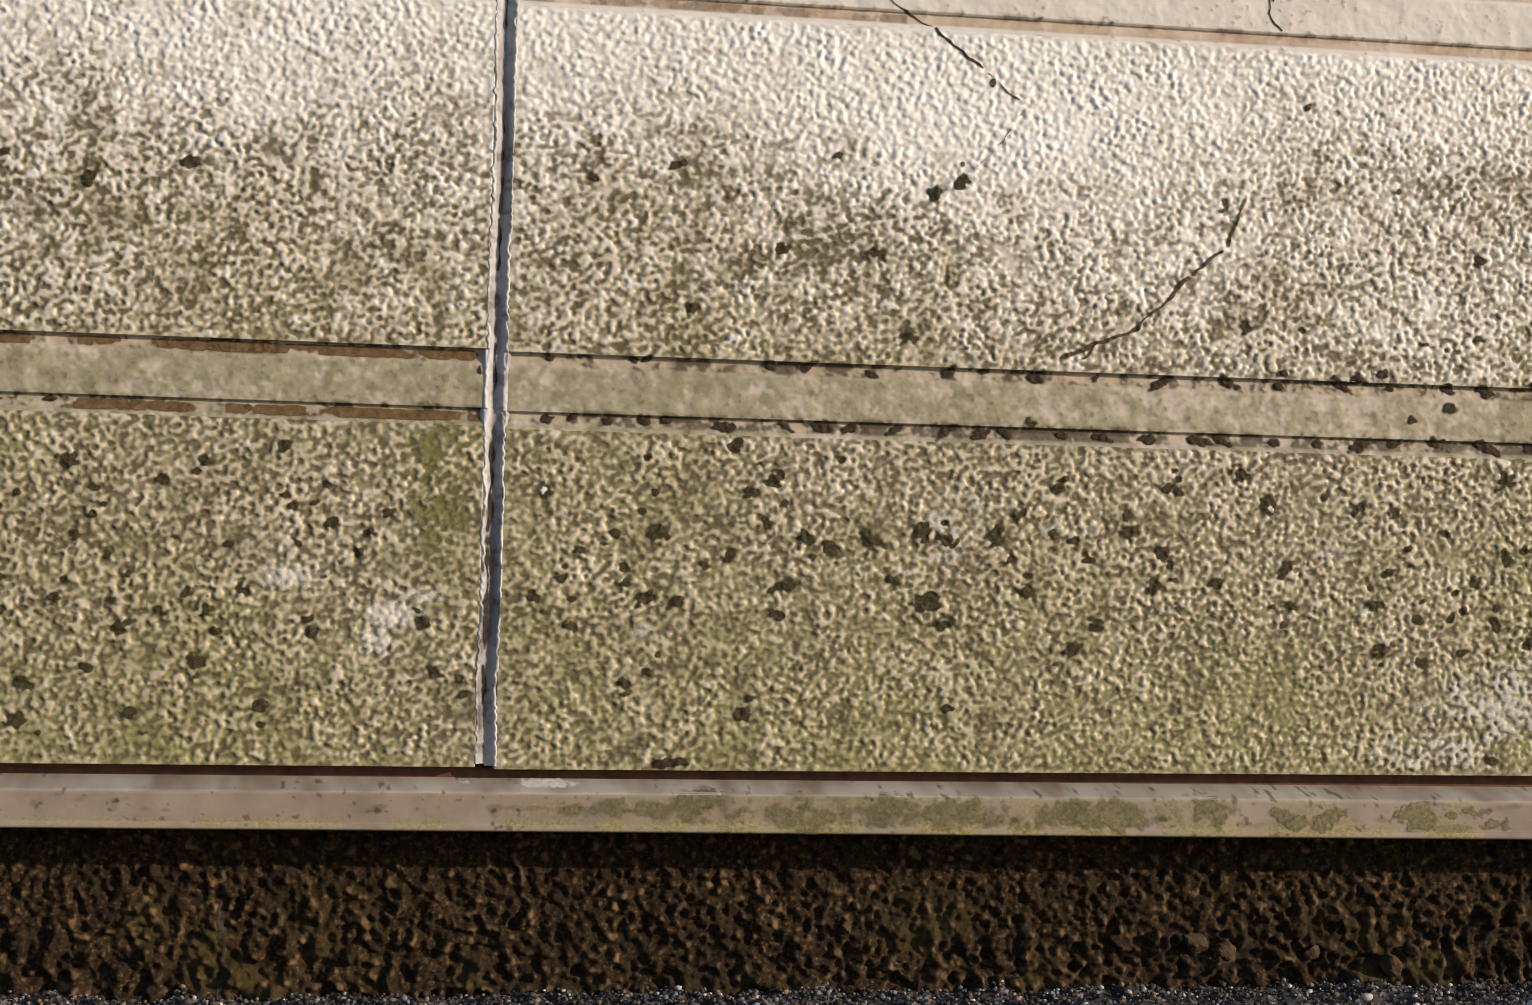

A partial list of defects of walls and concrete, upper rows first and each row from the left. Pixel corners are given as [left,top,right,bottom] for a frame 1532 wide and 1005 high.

crack [1268,0,1283,31]
crack [891,0,1022,144]
leakage [748,245,768,266]
leakage [787,202,867,266]
crack [1061,198,1247,360]
leakage [401,423,471,562]
leakage [927,510,962,570]
efflorescence [262,564,317,588]
efflorescence [361,587,445,658]
efflorescence [1368,654,1532,771]